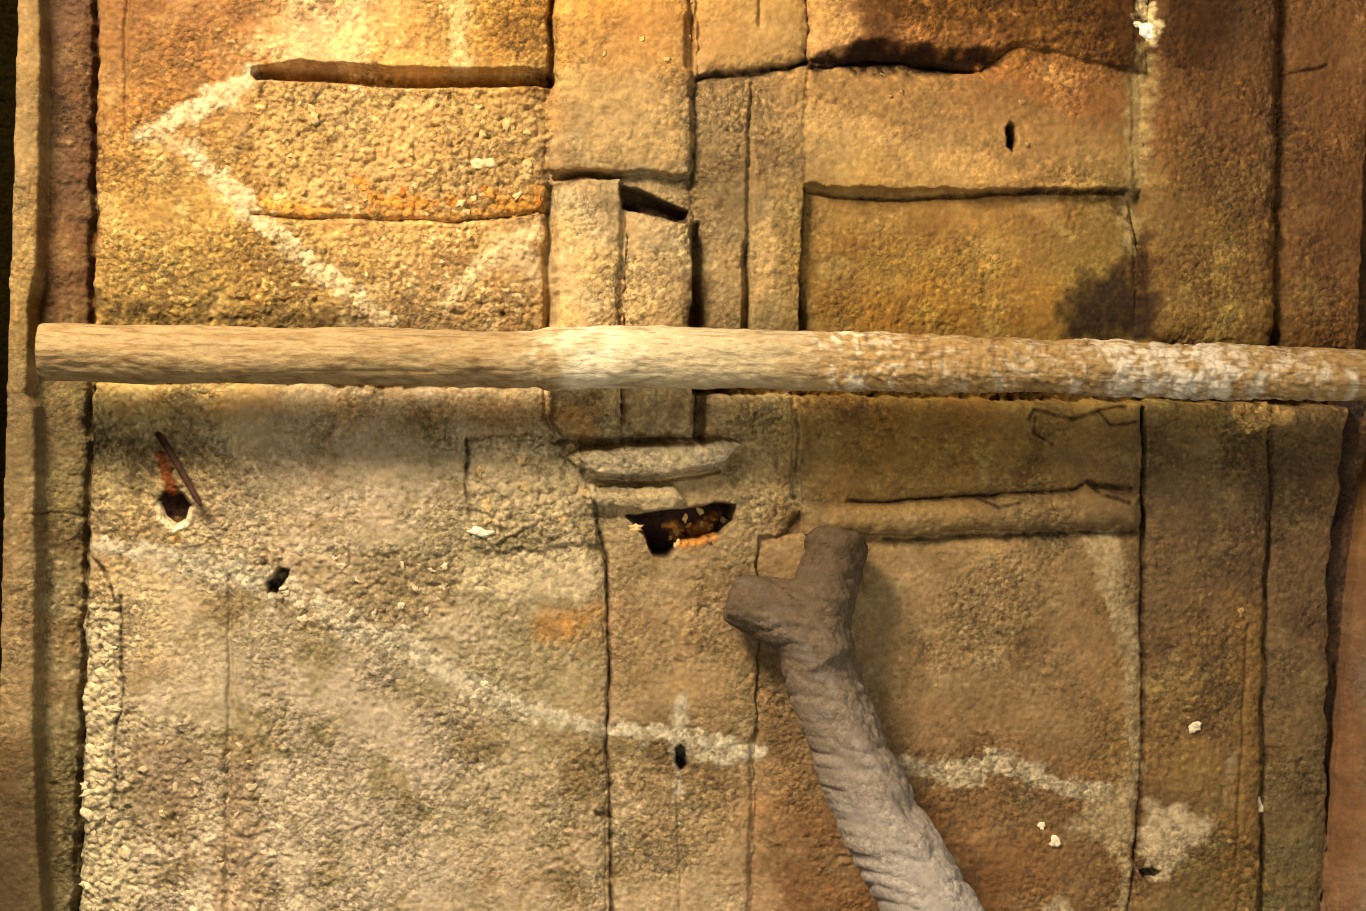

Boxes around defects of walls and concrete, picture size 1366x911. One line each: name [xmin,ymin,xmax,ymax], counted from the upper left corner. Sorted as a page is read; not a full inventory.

damp [800,37,995,76]
damp [1117,0,1165,255]
rust [248,196,331,219]
rust [346,170,543,221]
rust [156,451,178,495]
peeling [668,507,727,549]